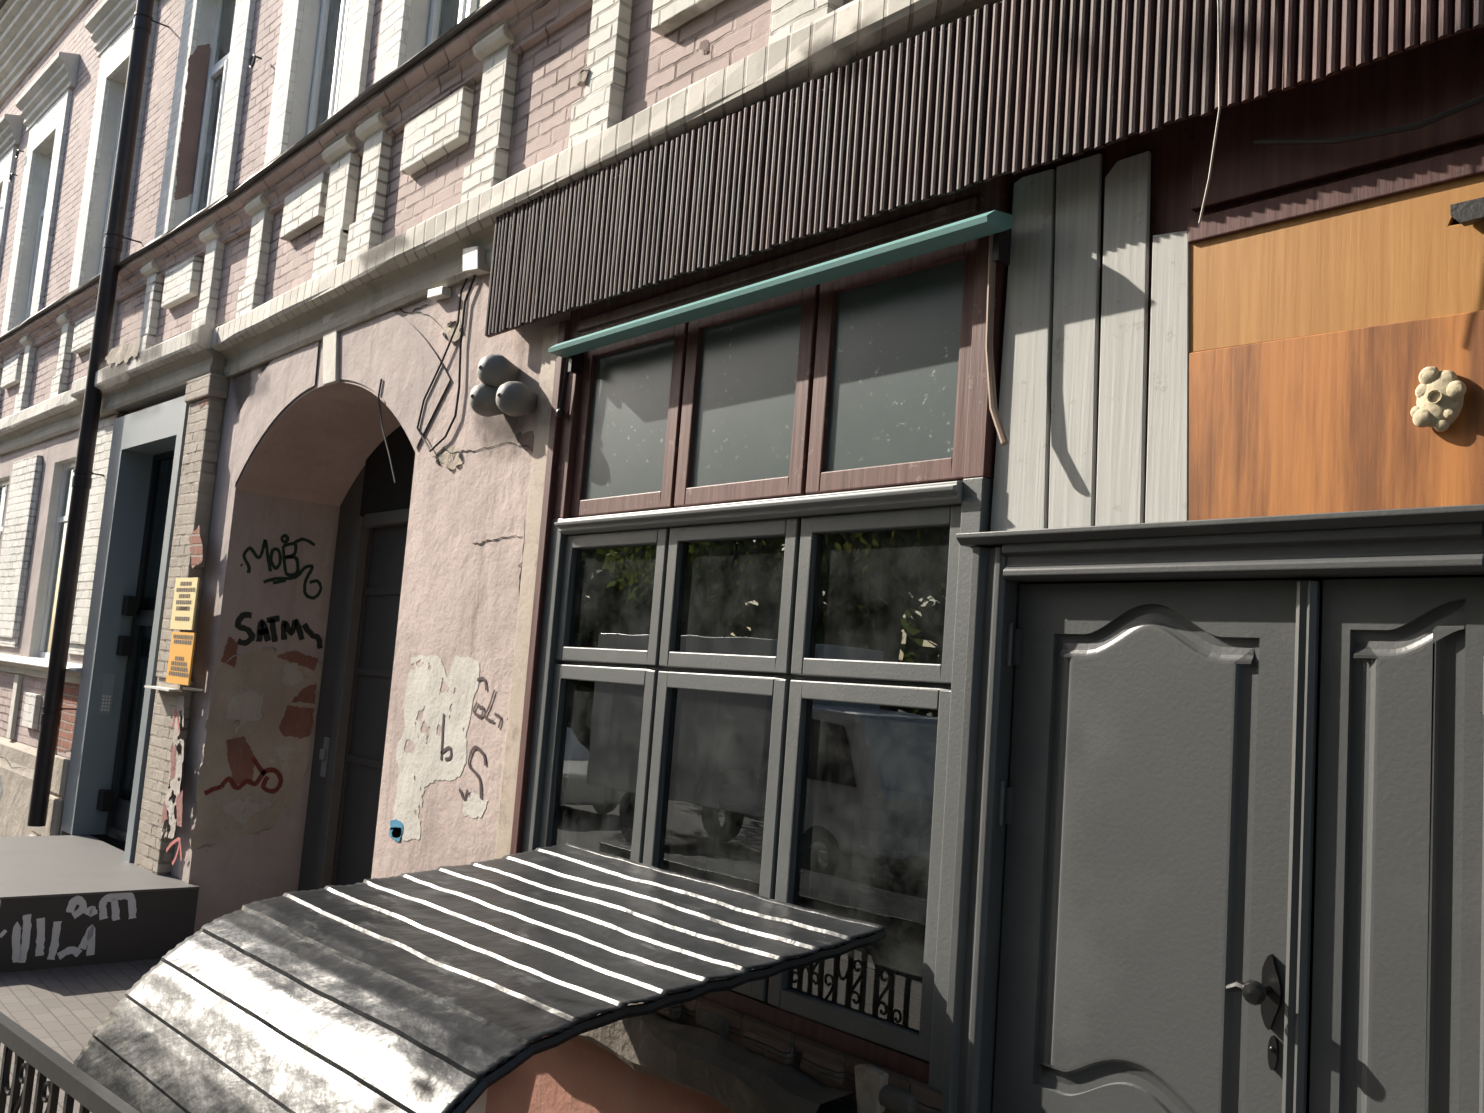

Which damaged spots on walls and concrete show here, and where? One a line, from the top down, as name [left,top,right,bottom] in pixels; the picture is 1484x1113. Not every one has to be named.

peeling [391,655,488,841]